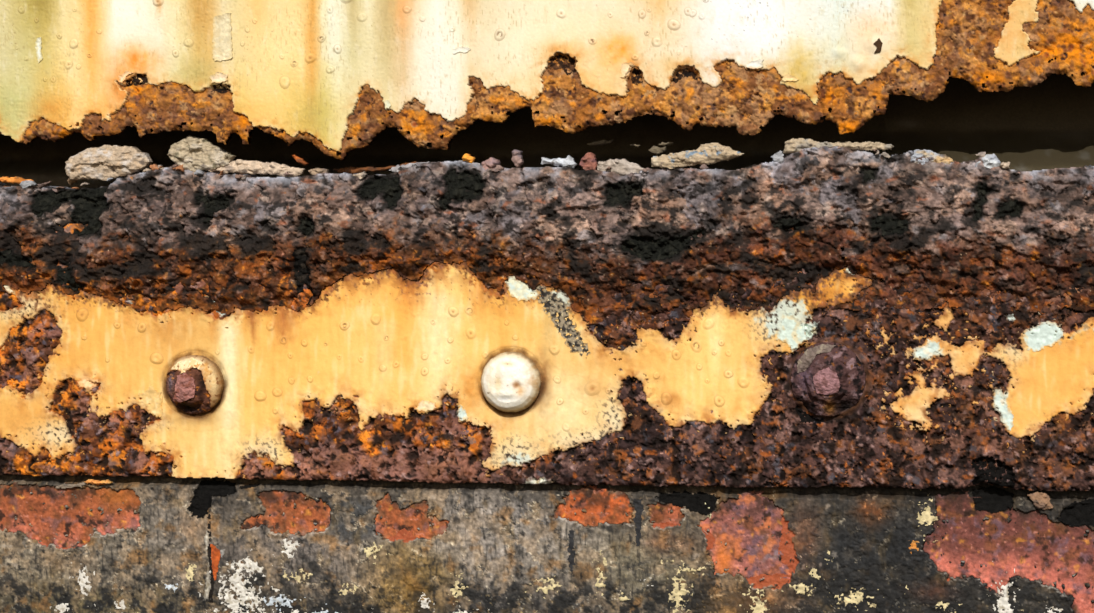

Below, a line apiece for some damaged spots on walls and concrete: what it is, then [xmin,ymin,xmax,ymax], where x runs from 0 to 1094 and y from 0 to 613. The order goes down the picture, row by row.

corrosion [23,0,1094,176]
corrosion [0,176,33,184]
corrosion [98,266,435,369]
corrosion [462,266,505,328]
peeling [505,275,540,301]
peeling [775,312,820,352]
peeling [1023,321,1063,352]
corrosion [0,291,216,489]
corrosion [236,279,1094,613]
peeling [0,480,141,548]
peeling [697,490,791,596]
peeling [918,490,1094,613]